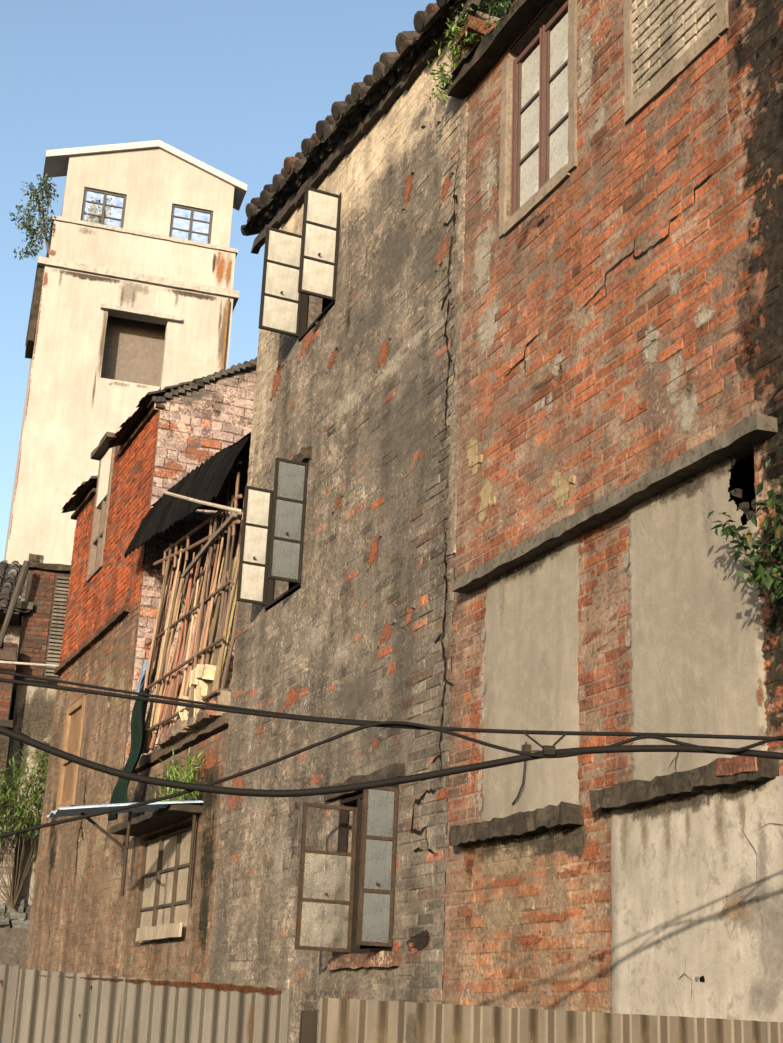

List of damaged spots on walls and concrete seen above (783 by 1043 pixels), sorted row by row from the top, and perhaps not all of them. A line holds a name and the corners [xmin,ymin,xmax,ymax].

corrosion [212,253,232,284]
crack [441,148,460,447]
crack [578,173,712,311]
damp [728,0,783,478]
spalling [731,483,757,520]
damp [631,782,765,819]
spalling [407,930,430,955]
crack [729,807,783,944]
damp [734,830,783,1010]